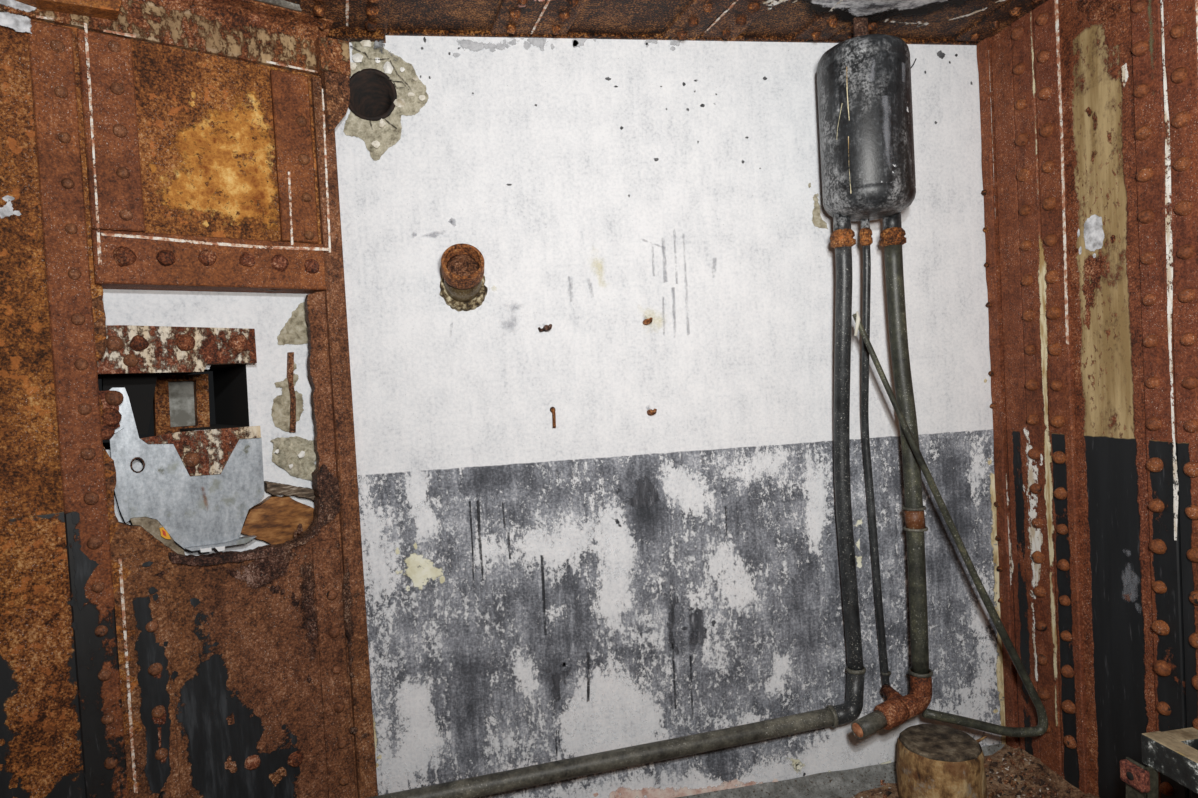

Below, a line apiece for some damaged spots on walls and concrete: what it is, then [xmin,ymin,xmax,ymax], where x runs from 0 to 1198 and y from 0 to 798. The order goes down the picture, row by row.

peeling [0,0,36,34]
spalling [343,40,431,161]
corrosion [1086,107,1112,145]
peeling [1077,214,1104,258]
corrosion [1072,247,1105,330]
spalling [270,302,317,480]
corrosion [212,530,297,595]
peeling [395,543,445,592]
leakage [476,500,484,581]
corrosion [0,514,83,798]
corrosion [225,756,237,773]
corrosion [269,767,287,786]